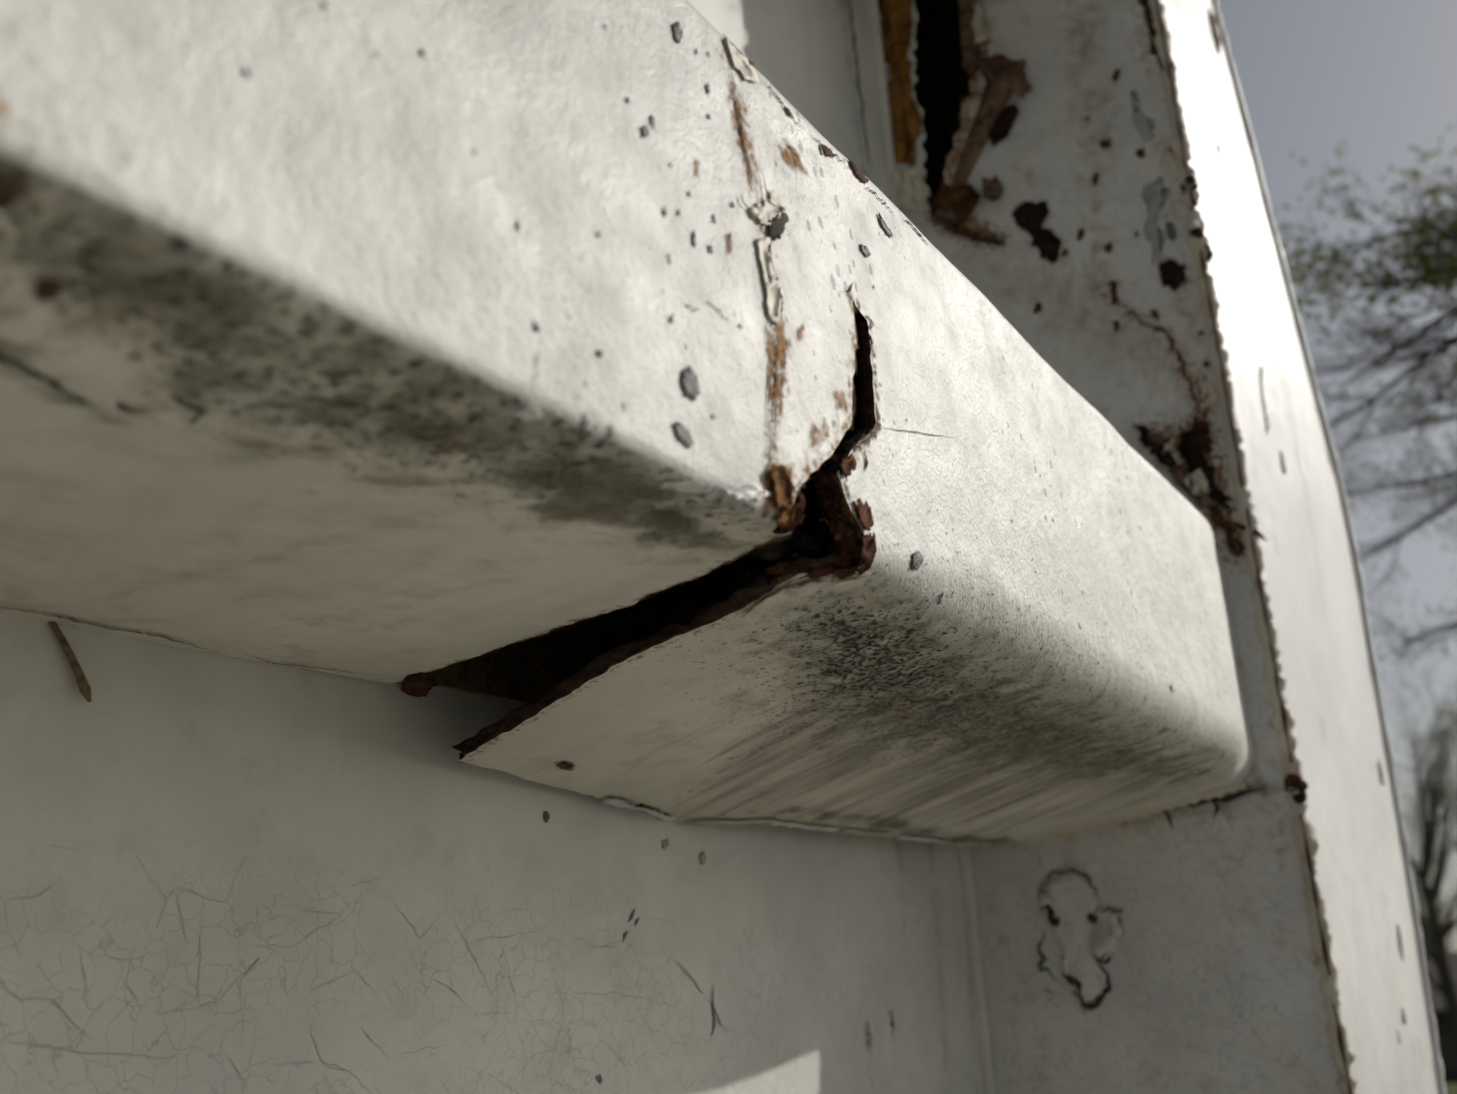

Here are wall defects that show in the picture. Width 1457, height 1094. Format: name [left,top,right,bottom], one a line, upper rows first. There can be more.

peeling [969,0,988,43]
rust [779,144,808,175]
peeling [982,176,1004,202]
peeling [1011,201,1085,263]
peeling [1142,165,1200,291]
leakage [0,165,777,550]
rust [725,296,881,581]
leakage [651,506,1244,794]
crack [0,845,723,1094]
peeling [1037,867,1125,1010]